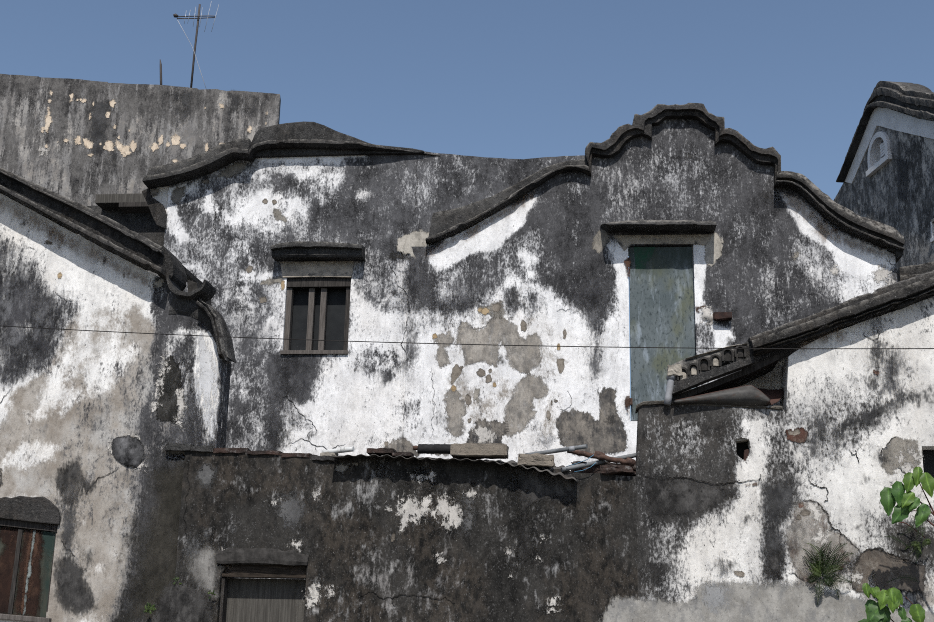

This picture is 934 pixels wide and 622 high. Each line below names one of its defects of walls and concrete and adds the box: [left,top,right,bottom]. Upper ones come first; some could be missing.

peeling [38,100,137,157]
leakage [0,249,61,373]
leakage [505,289,536,311]
leakage [569,280,605,375]
crack [288,399,339,450]
peeling [383,436,419,457]
peeling [432,300,628,456]
spalling [786,427,808,443]
peeling [878,437,924,475]
leakage [508,467,582,560]
leakage [758,479,796,585]
spalling [786,500,927,594]